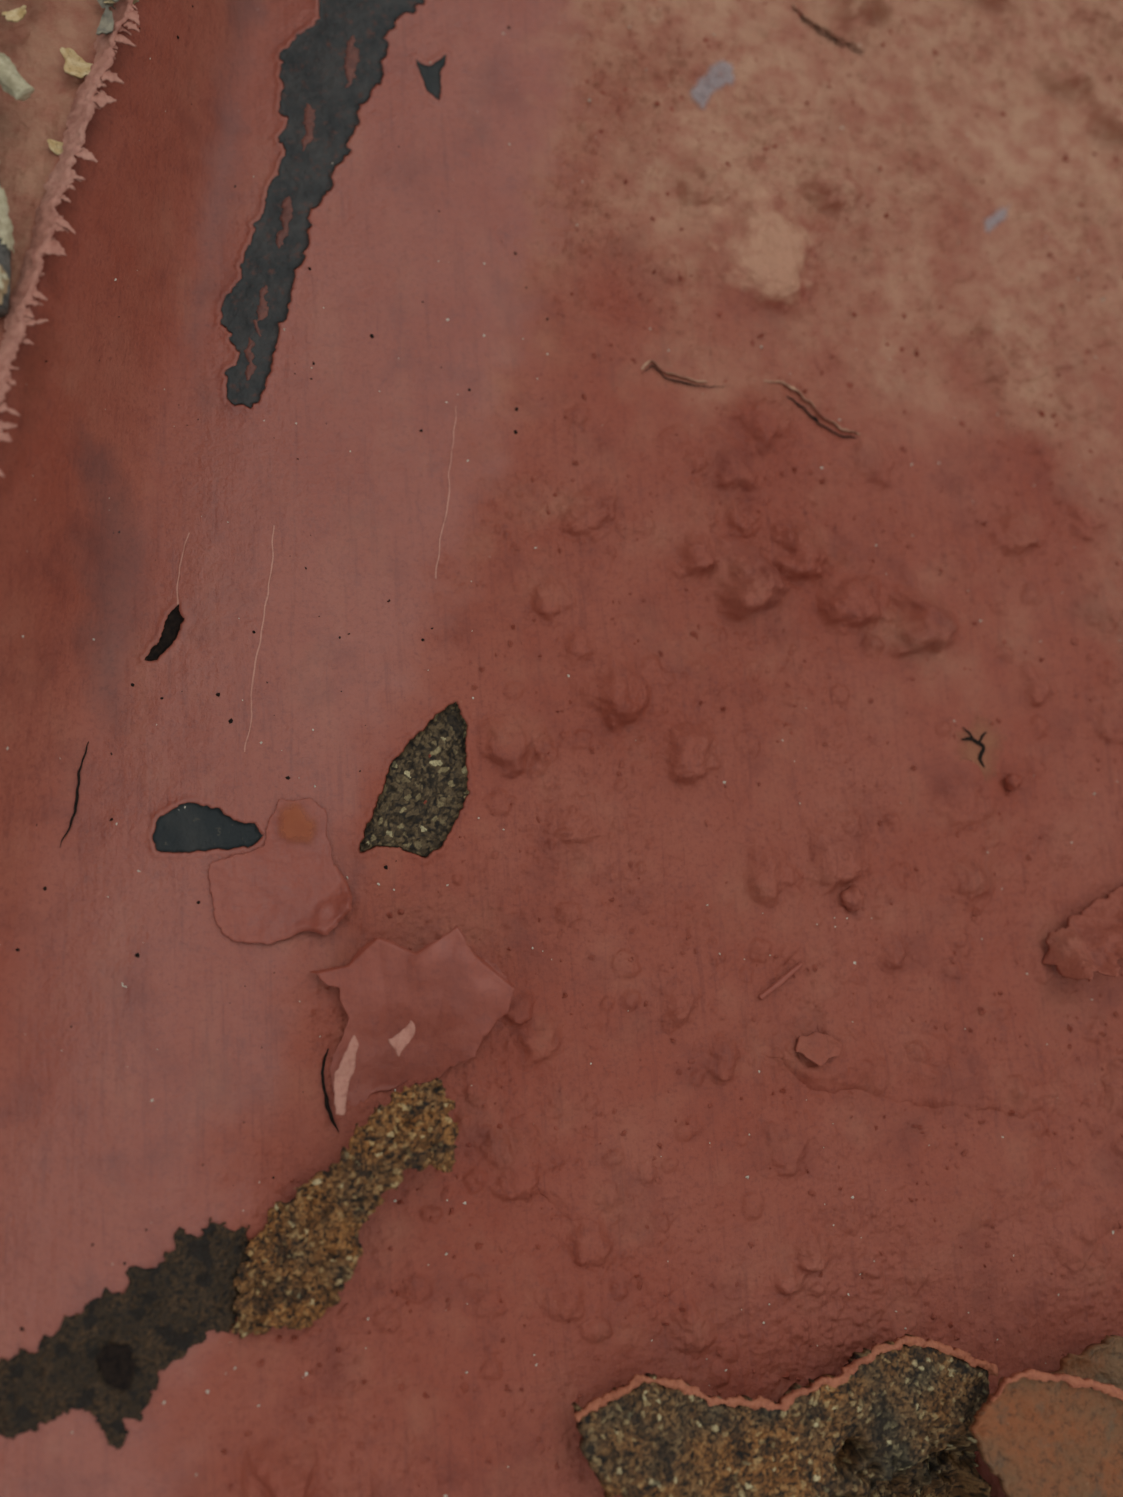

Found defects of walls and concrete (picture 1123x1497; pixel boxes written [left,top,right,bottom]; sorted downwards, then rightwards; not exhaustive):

peeling [221,0,424,408]
peeling [416,55,446,100]
peeling [145,604,184,661]
spalling [0,926,515,1449]